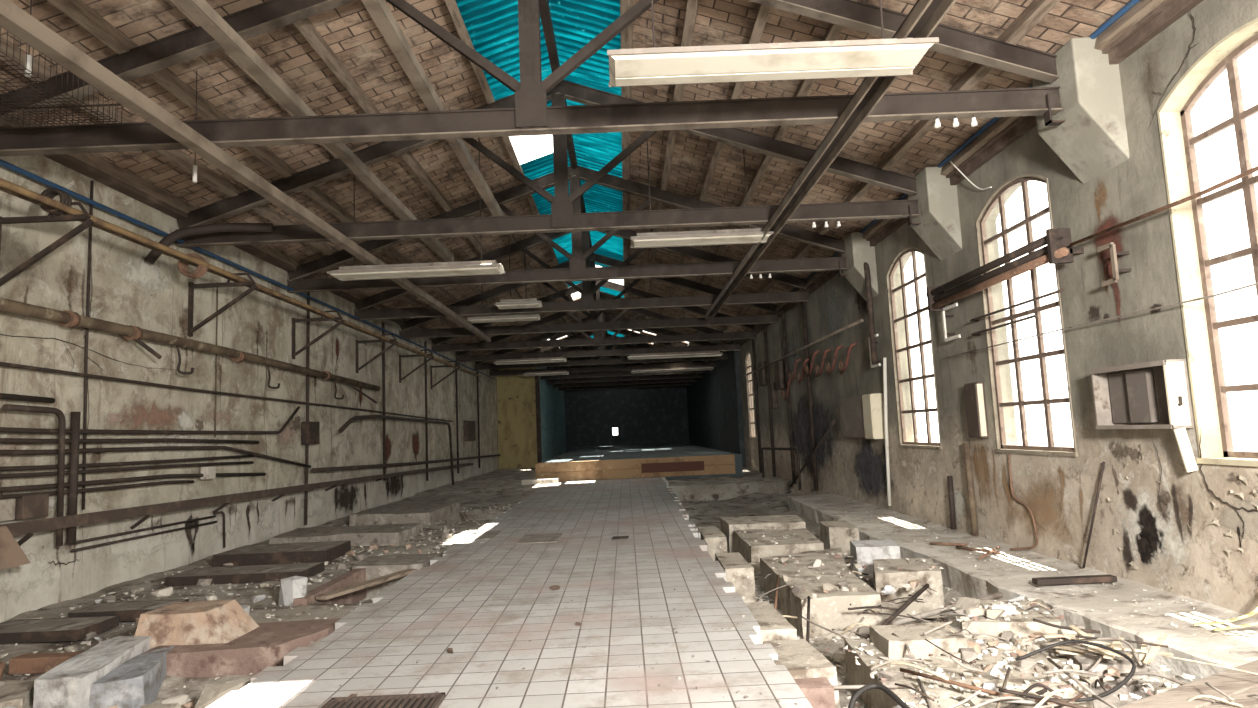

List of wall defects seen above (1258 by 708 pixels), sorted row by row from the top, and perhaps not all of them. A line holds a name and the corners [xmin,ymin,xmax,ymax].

flaking render [102,395,236,453]
leakage [185,515,199,557]
leakage [335,484,367,512]
leakage [854,439,887,498]
flaking render [1108,442,1193,575]
crack [1199,428,1258,542]
flaking render [1210,473,1258,548]